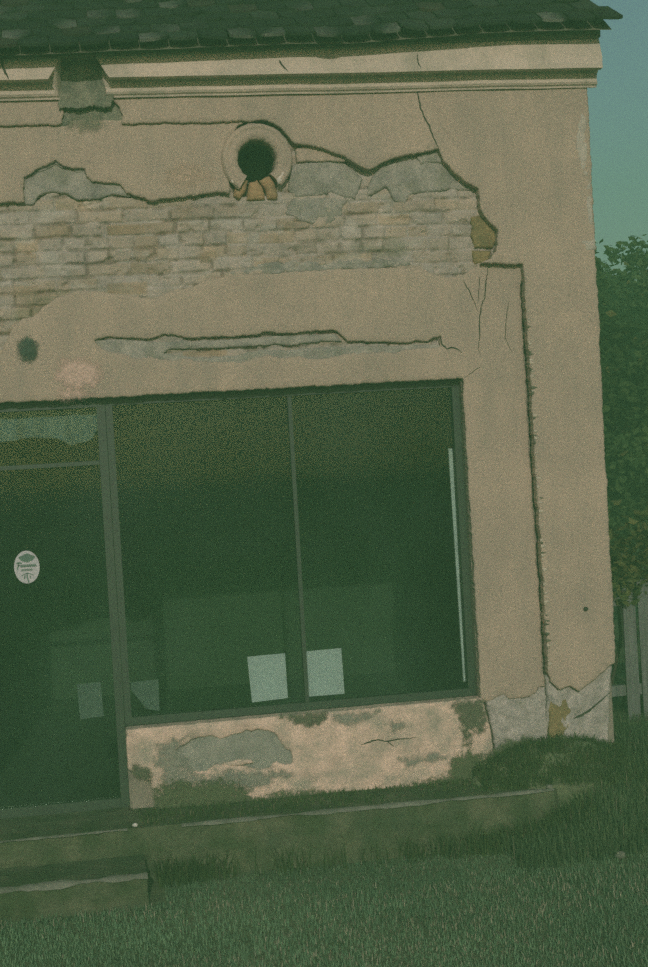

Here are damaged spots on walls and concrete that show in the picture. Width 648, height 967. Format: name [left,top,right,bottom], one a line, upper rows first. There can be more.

crack [417,91,440,151]
crack [440,273,488,377]
flaking render [484,539,612,750]
flaking render [177,729,292,771]